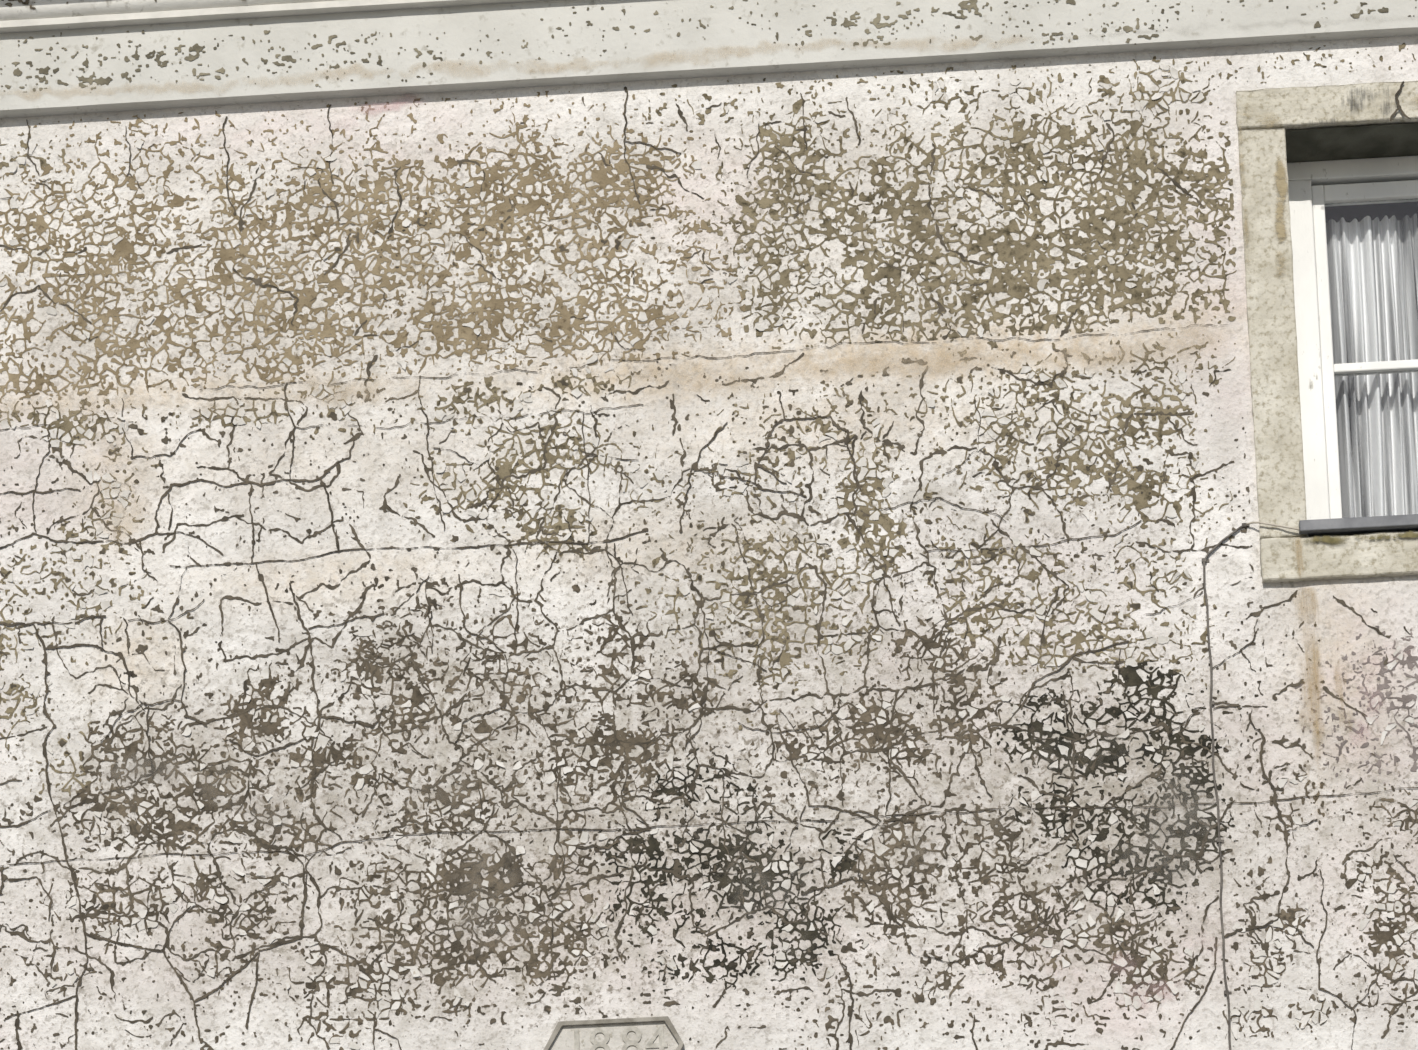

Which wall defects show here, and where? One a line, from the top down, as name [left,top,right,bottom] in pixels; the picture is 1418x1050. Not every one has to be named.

spalling [0,24,541,92]
spalling [540,6,658,57]
spalling [729,0,1194,49]
peeling [1257,43,1416,83]
spalling [1350,2,1389,18]
crack [1390,81,1411,122]
crack [0,119,39,199]
crack [222,116,236,215]
crack [326,104,334,183]
crack [623,86,681,203]
peeling [1237,590,1298,630]
crack [0,324,1418,1050]